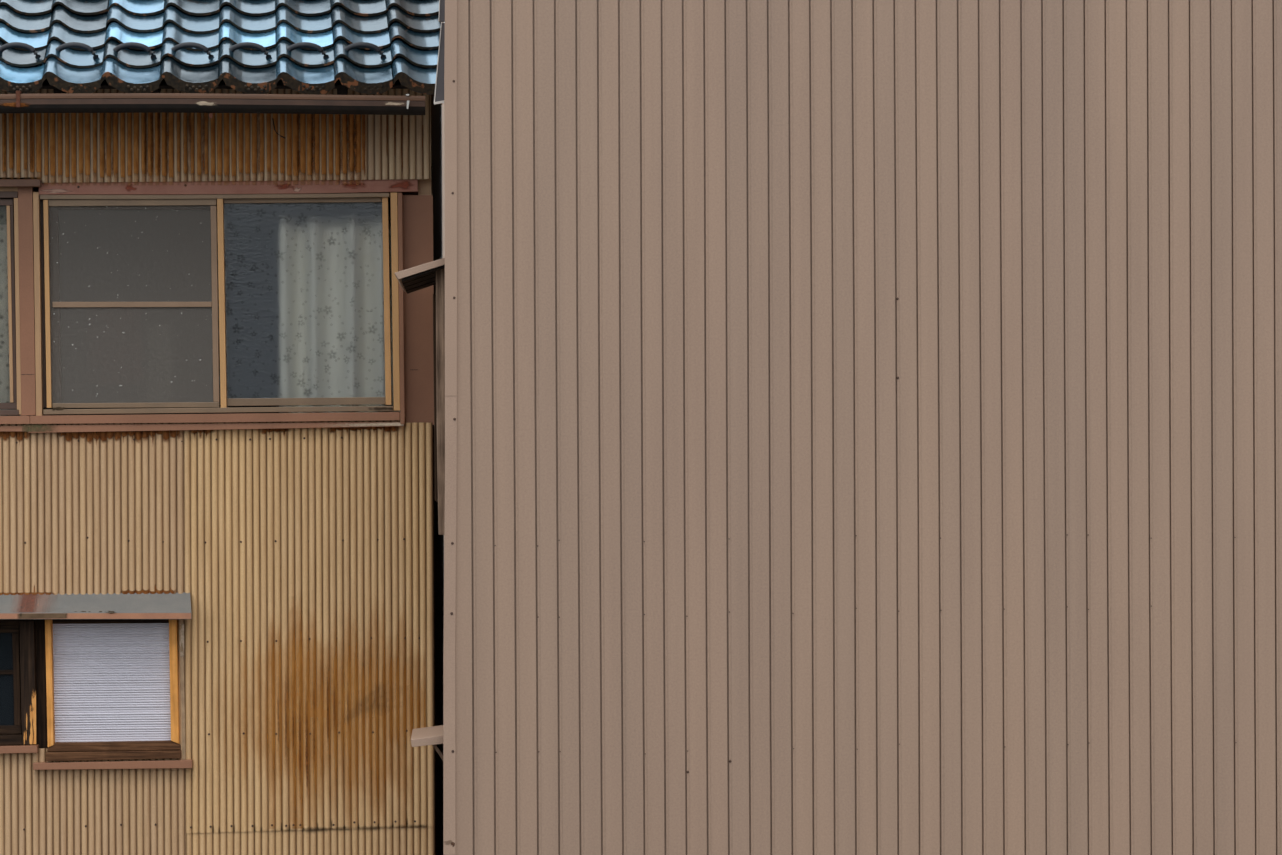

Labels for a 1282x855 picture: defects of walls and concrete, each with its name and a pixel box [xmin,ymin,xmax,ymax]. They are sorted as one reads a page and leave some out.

corrosion [0,102,366,192]
corrosion [386,115,424,169]
corrosion [266,623,426,829]